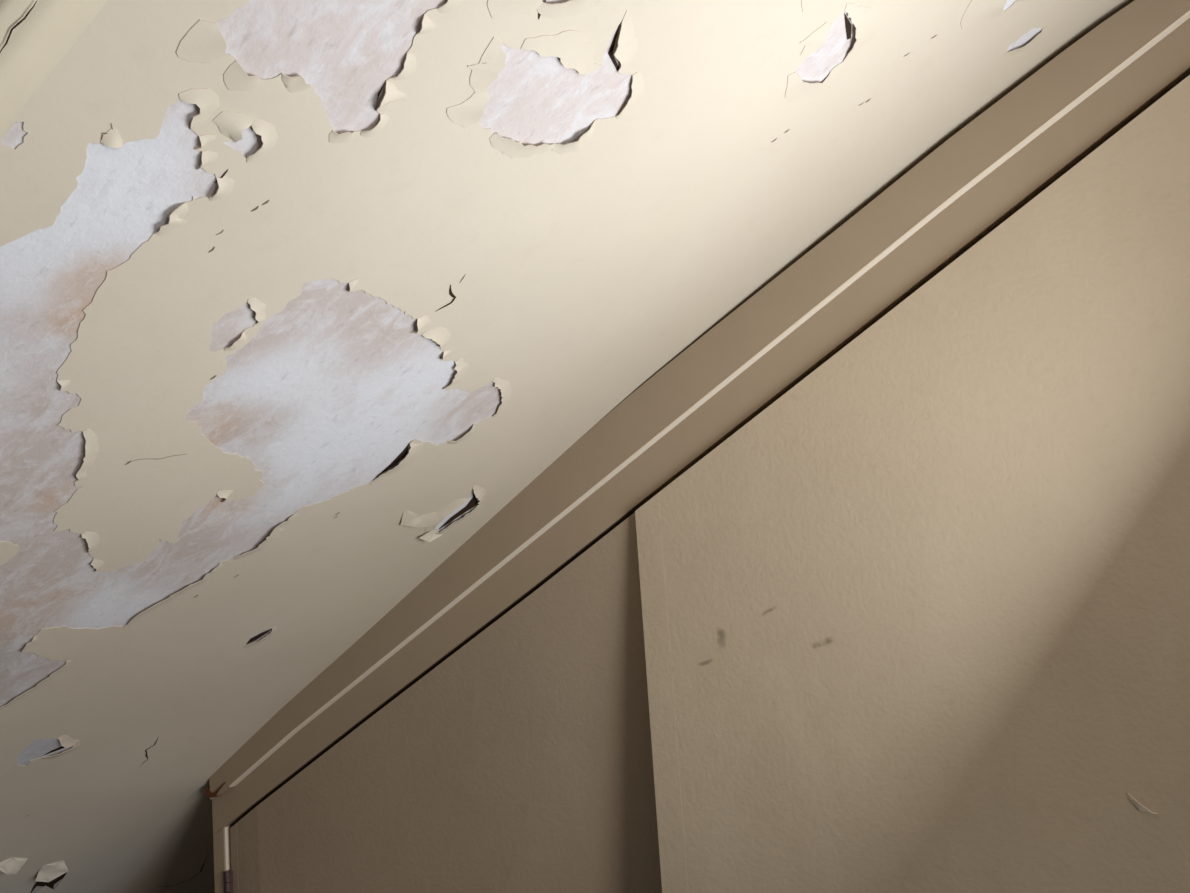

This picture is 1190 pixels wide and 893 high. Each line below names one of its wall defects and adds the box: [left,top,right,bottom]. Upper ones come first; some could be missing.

peeling [785,3,875,103]
peeling [1004,27,1046,57]
peeling [446,0,644,158]
peeling [0,0,512,710]
peeling [17,736,80,766]
peeling [0,857,27,875]
peeling [30,860,68,893]